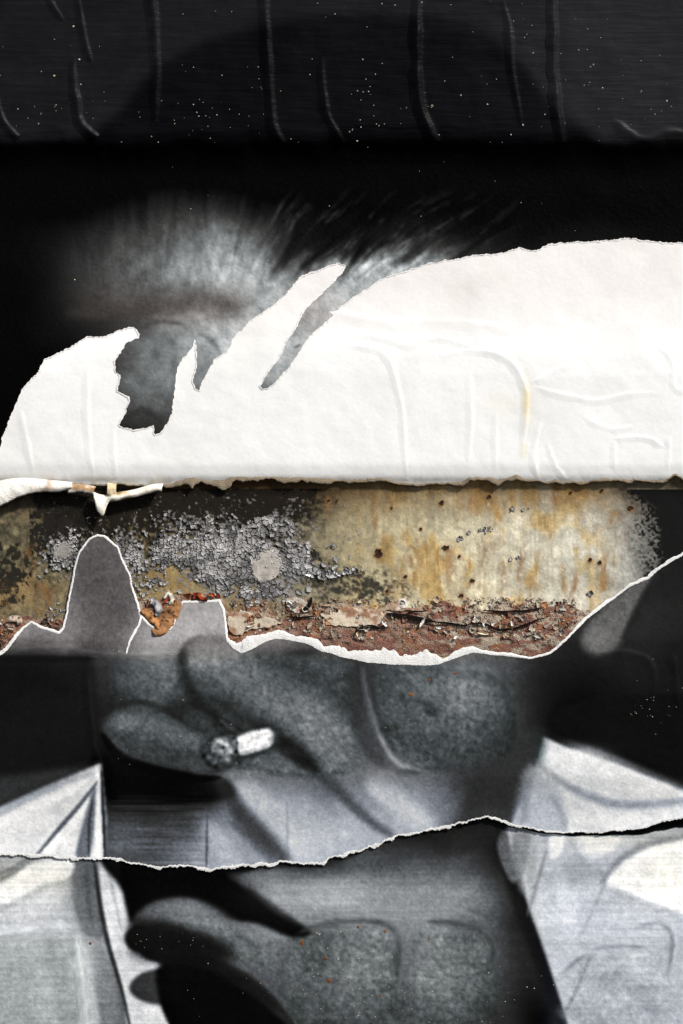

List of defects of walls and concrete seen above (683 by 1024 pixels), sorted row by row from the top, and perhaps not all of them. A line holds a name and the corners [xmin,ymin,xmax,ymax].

rust [0,616,64,651]
peeling [37,492,426,635]
rust [138,545,591,657]